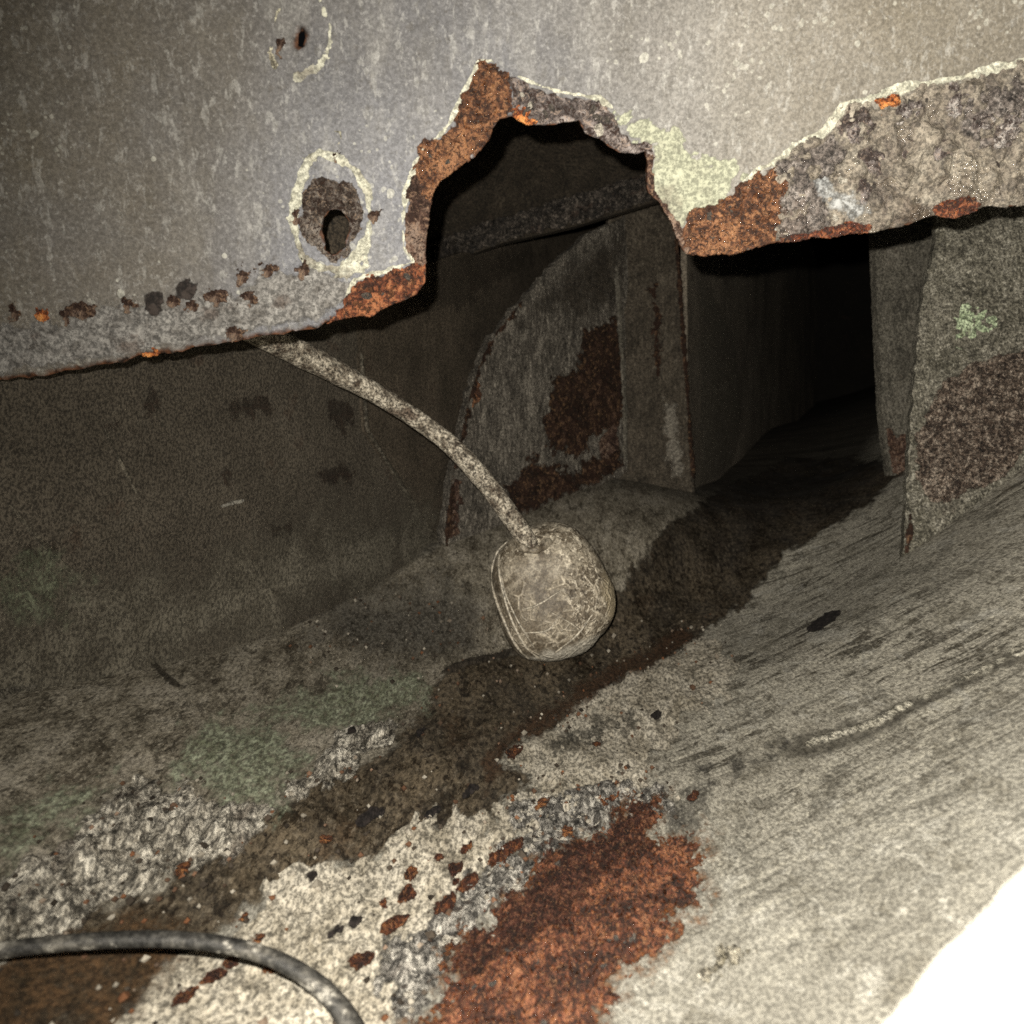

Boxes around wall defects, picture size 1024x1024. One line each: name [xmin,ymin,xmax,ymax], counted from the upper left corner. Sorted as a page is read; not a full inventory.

peeling [286,131,424,297]
peeling [433,59,493,140]
corrosion [0,59,1024,514]
peeling [518,58,1024,227]
leakage [58,454,903,935]
leakage [0,950,156,1024]
corrosion [401,790,716,1024]